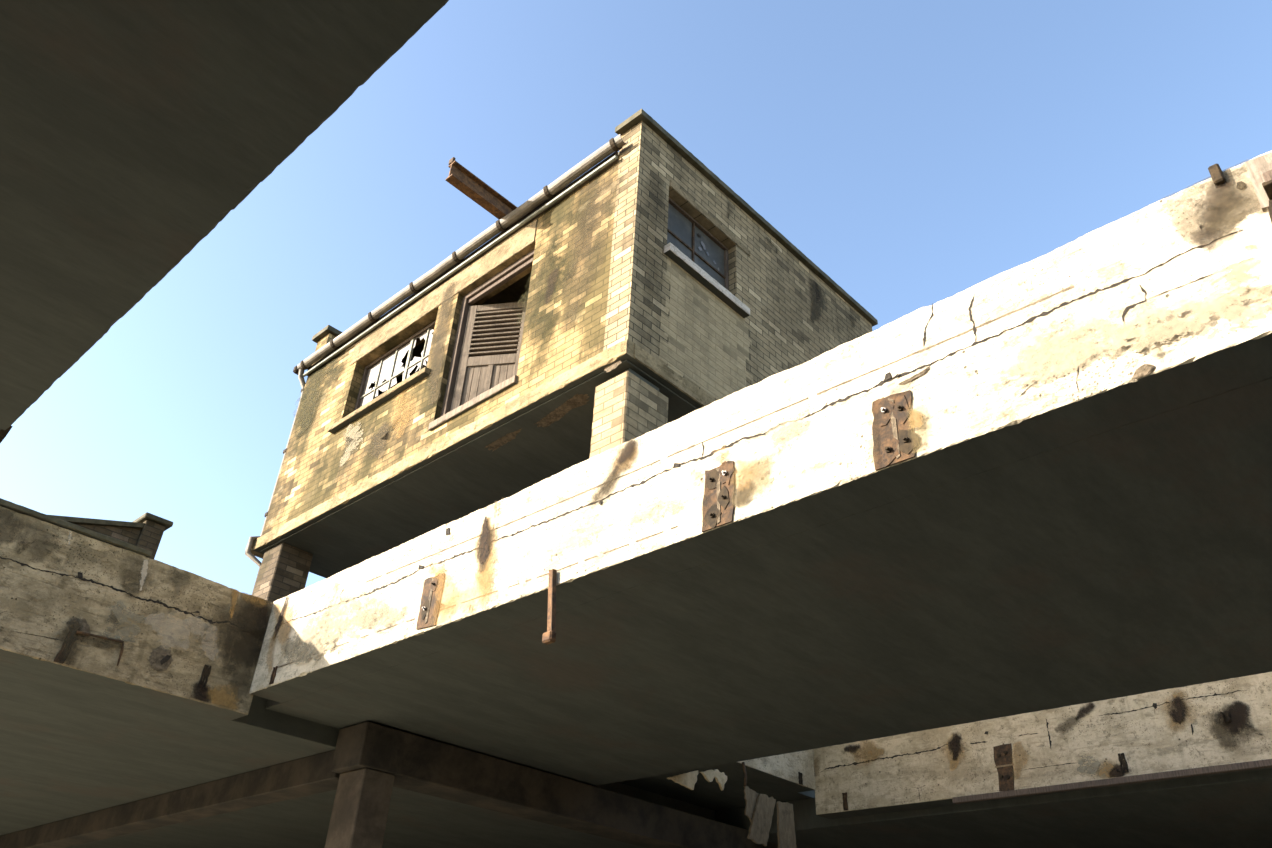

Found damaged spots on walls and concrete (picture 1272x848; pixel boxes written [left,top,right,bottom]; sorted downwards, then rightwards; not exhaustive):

water stain [1194,182,1231,248]
crack [267,229,1260,635]
water stain [600,440,635,493]
rust [704,456,769,529]
crack [0,556,230,624]
rust [421,569,444,620]
water stain [1211,701,1259,748]